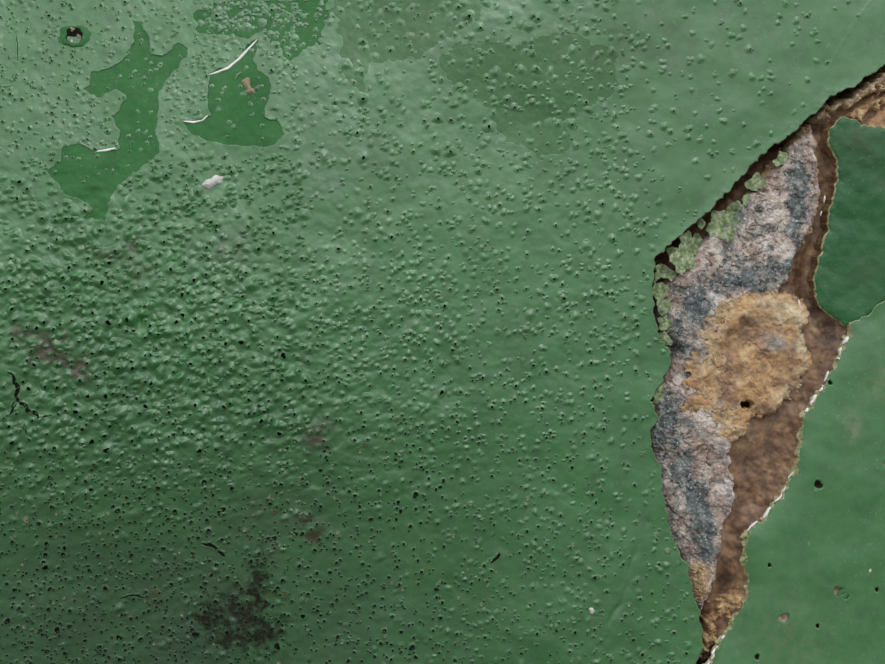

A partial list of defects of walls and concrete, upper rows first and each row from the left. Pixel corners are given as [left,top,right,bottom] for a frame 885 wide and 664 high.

peeling [47,22,187,221]
peeling [183,0,330,147]
crack [7,370,53,434]
spalling [650,65,885,664]